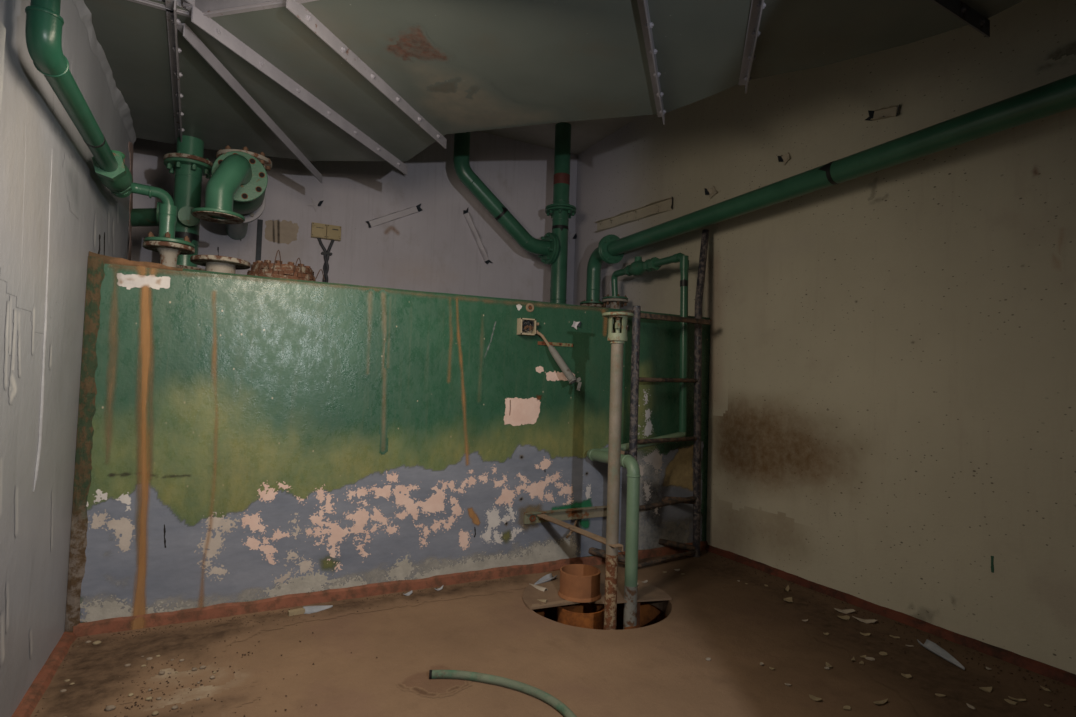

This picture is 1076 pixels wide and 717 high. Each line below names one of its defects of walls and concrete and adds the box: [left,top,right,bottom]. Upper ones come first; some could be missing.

rust [111,265,190,630]
peeling [80,441,704,622]
peeling [504,396,541,426]
peeling [638,389,654,438]
water stain [699,242,890,576]